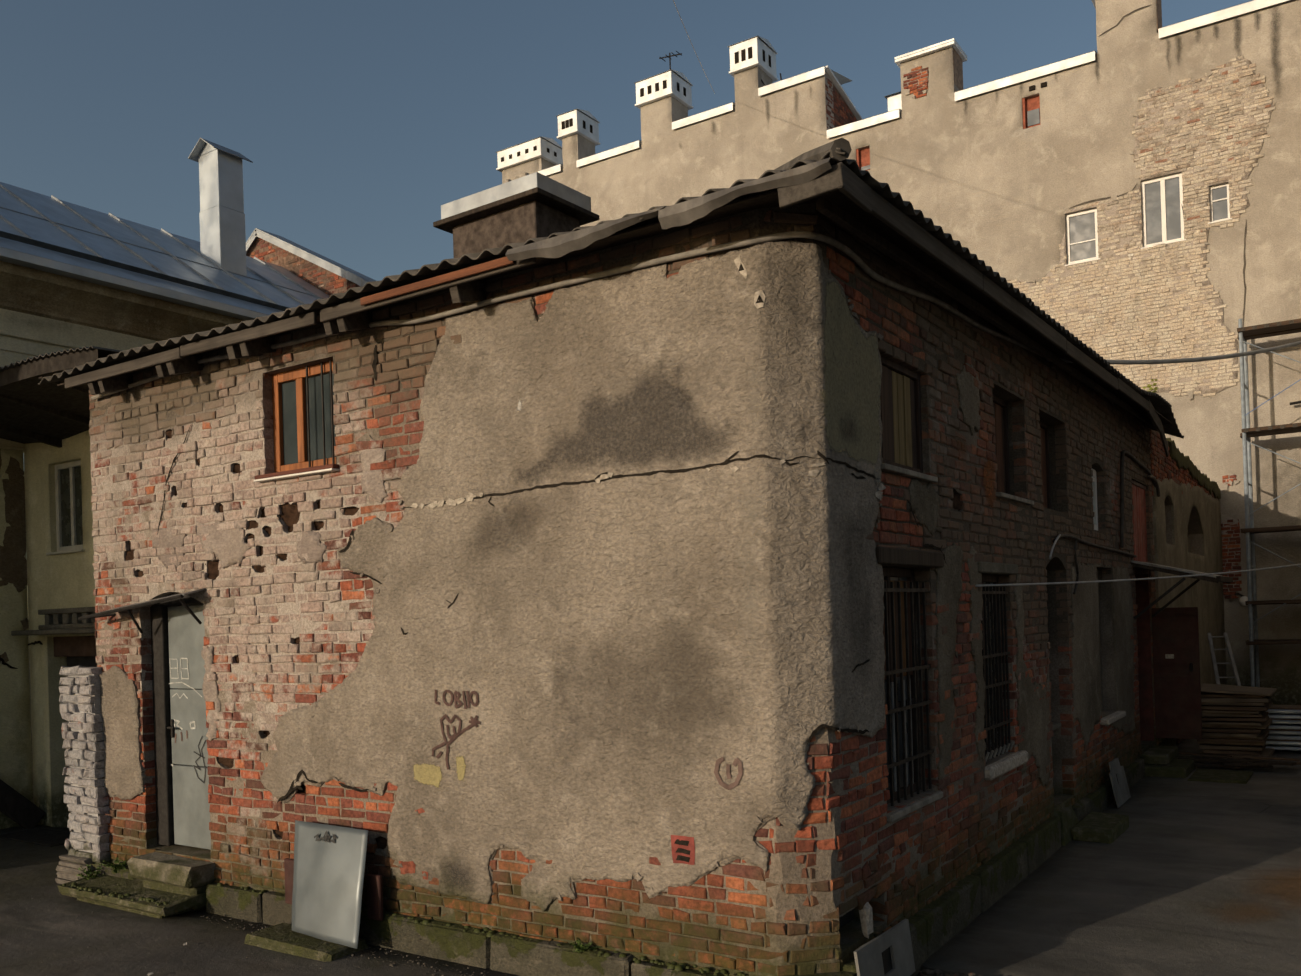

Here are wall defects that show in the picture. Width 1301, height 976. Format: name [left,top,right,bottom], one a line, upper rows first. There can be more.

flaking render [1007,55,1275,400]
damp [521,376,725,480]
flaking render [0,454,27,593]
spalling [125,541,144,577]
spalling [205,561,219,579]
flaking render [246,500,405,707]
crack [404,450,946,563]
spalling [217,757,234,768]
flaking render [275,777,428,897]
flaking render [486,721,931,976]